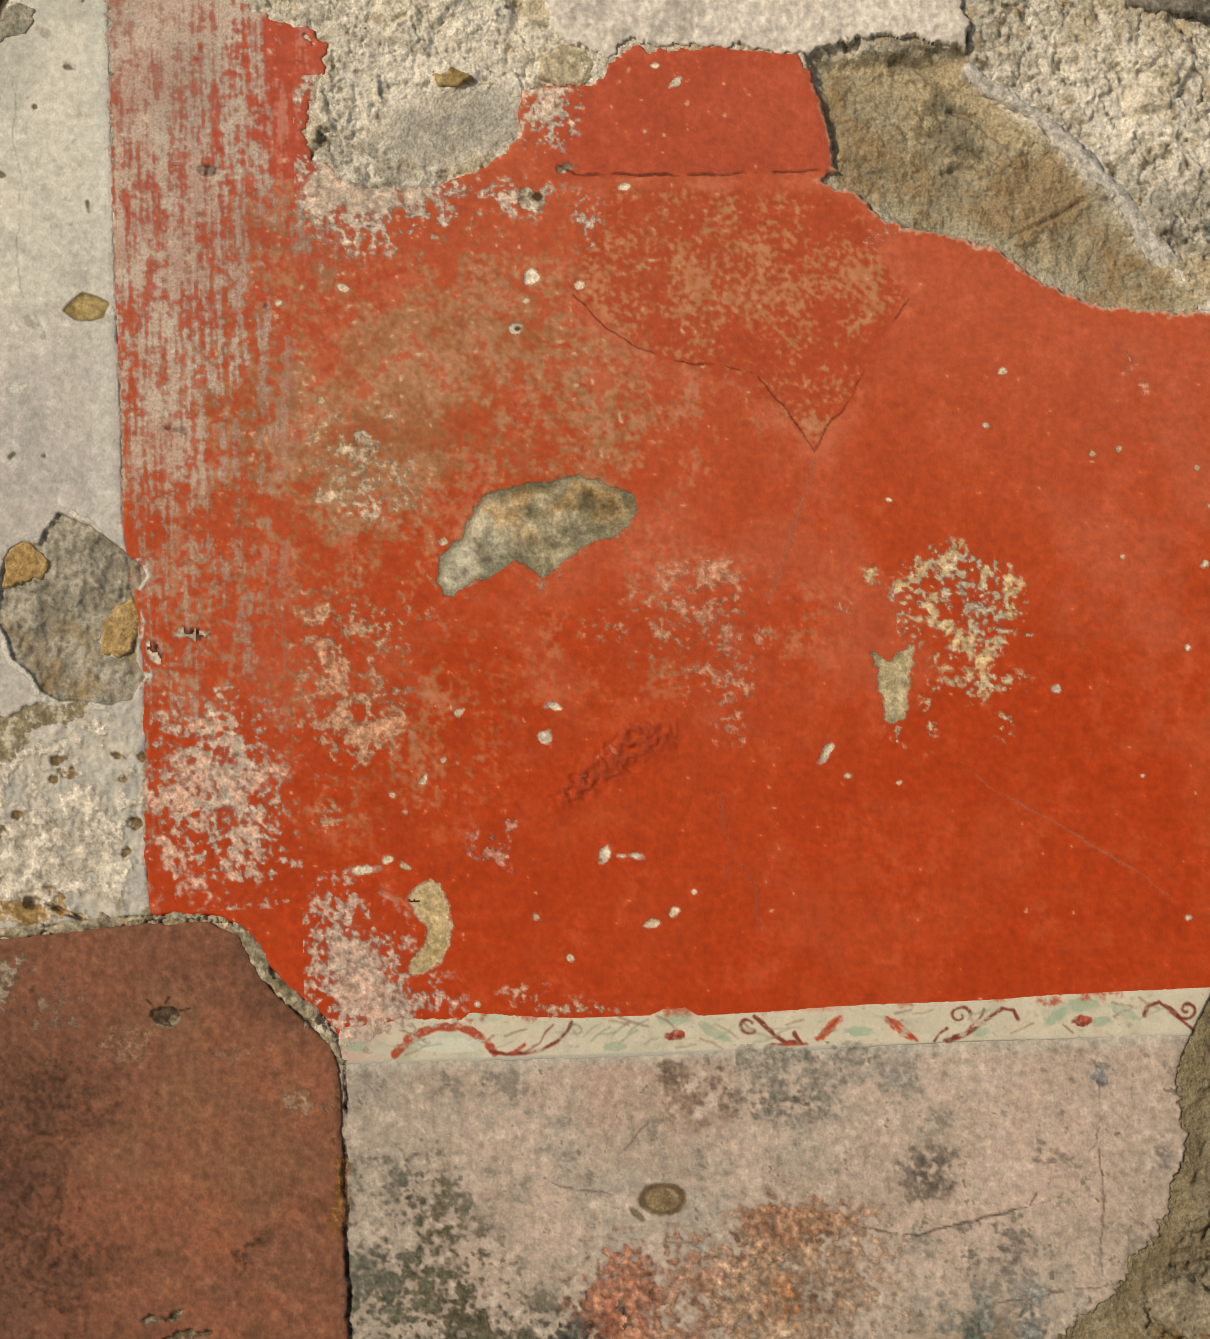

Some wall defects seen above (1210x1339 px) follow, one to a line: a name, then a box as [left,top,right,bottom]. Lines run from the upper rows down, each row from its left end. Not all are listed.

crack [0,0,8,15]
crack [567,169,739,177]
peeling [574,200,600,247]
peeling [0,0,581,926]
spalling [428,474,637,597]
peeling [863,567,877,585]
peeling [870,539,1032,742]
peeling [0,955,36,1010]
peeling [303,856,480,1054]
peeling [499,983,618,1017]
peeling [89,996,189,1061]
peeling [142,1309,213,1339]